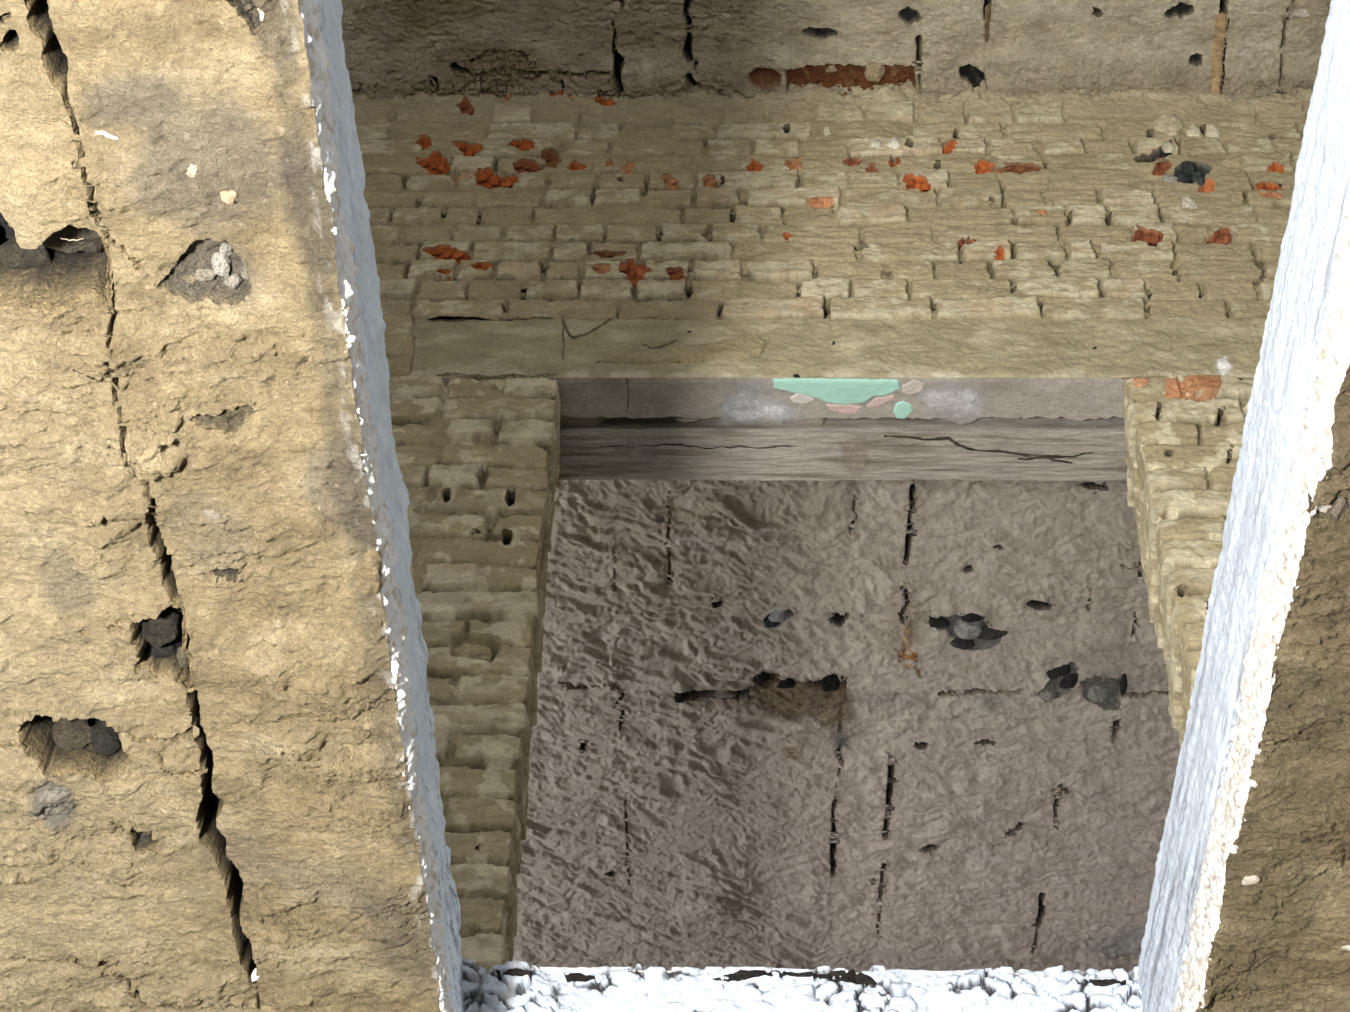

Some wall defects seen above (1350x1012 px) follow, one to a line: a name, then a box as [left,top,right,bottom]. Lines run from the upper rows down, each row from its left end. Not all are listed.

spalling [745,62,920,97]
crack [1220,18,1229,94]
spalling [157,238,252,305]
crack [884,435,1093,464]
crack [0,0,261,1010]
spalling [927,613,1008,651]